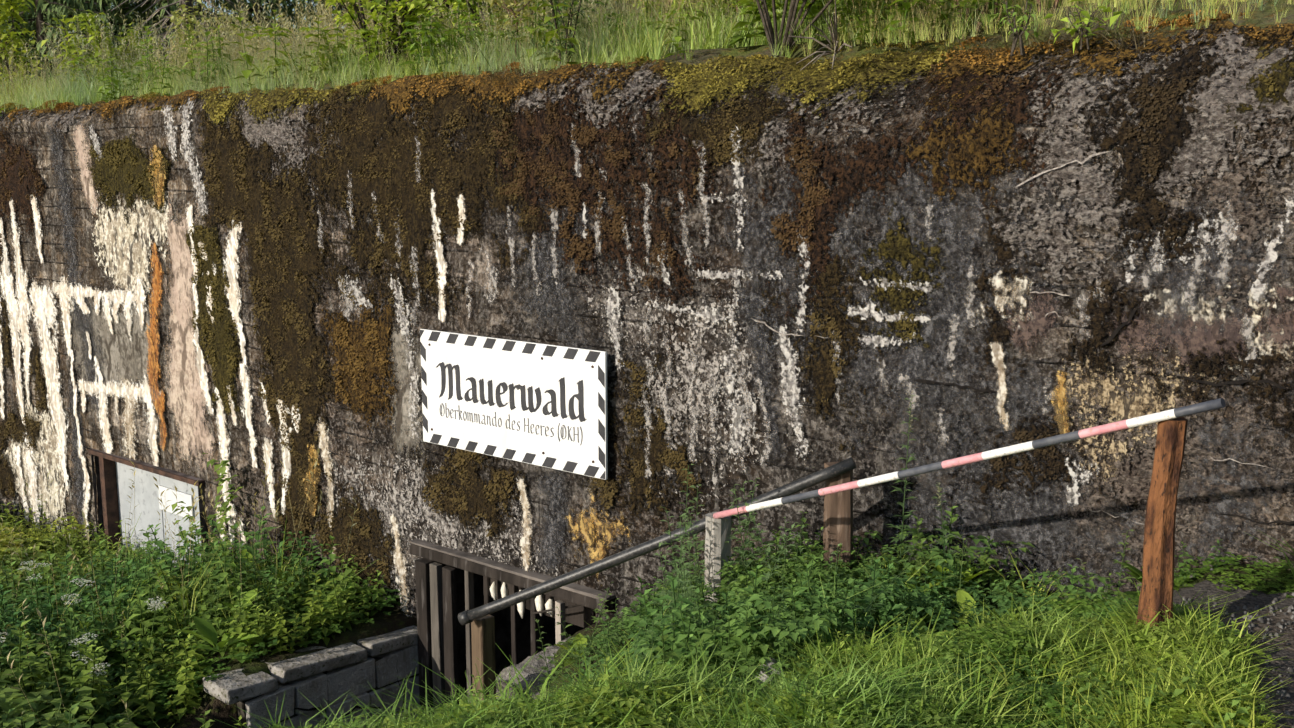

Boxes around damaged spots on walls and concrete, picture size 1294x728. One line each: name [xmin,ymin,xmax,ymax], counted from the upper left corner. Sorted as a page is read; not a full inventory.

leakage [0,125,161,536]
rust [145,243,167,450]
efflorescence [161,97,300,548]
efflorescence [431,190,466,322]
leakage [505,179,624,369]
leakage [646,94,1143,601]
leakage [1112,192,1294,334]
efflorescence [318,424,334,528]
leakage [1178,420,1286,567]